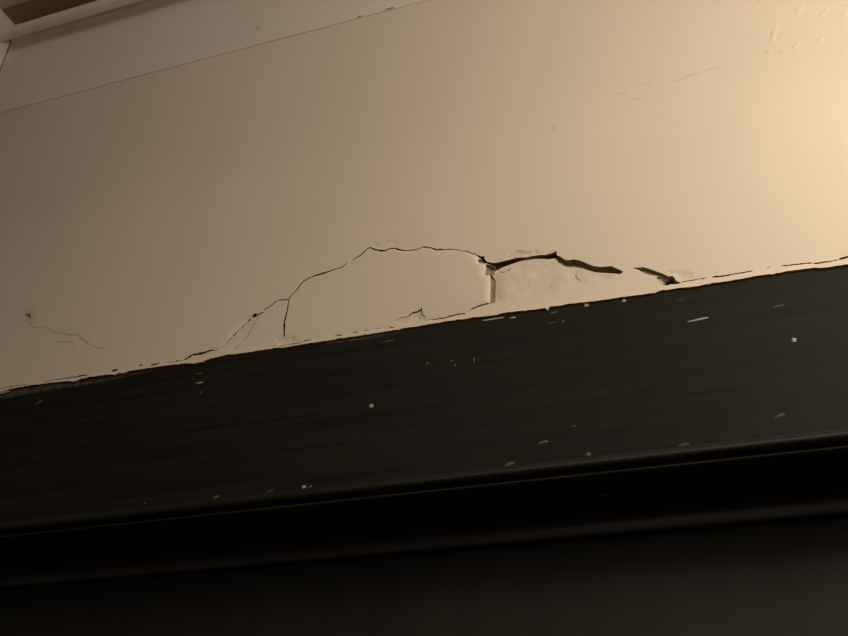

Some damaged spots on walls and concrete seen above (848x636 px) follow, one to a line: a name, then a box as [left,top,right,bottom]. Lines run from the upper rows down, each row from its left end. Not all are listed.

crack [139,246,848,366]